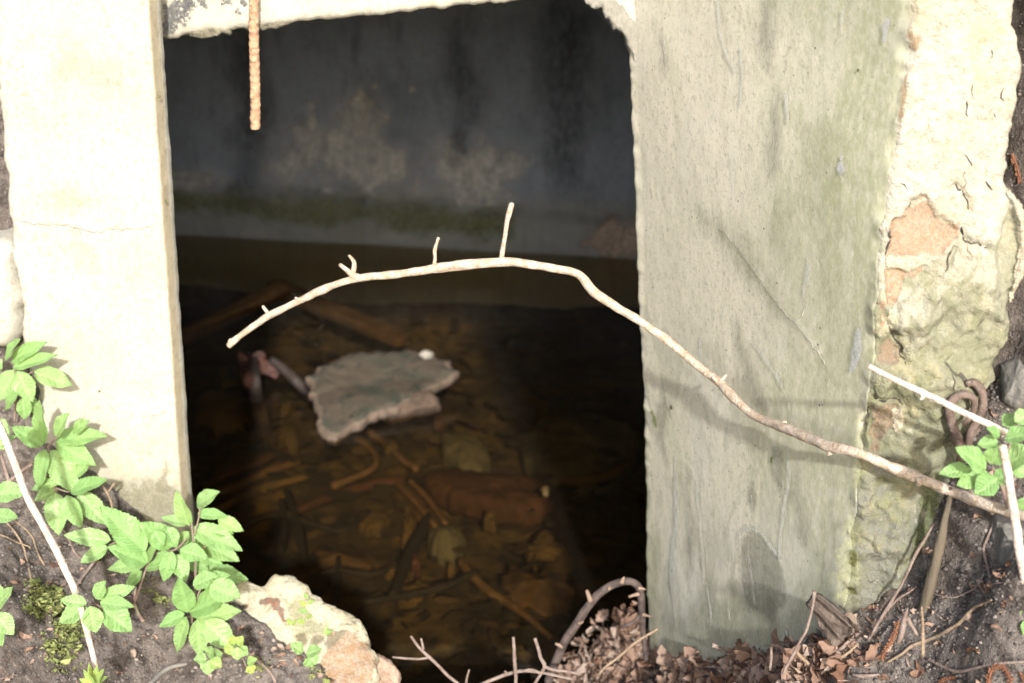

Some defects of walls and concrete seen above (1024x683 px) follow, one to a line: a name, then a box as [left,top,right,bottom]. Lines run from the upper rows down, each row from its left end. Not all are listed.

leakage [275,85,405,191]
crack [21,221,153,234]
spalling [880,194,962,326]